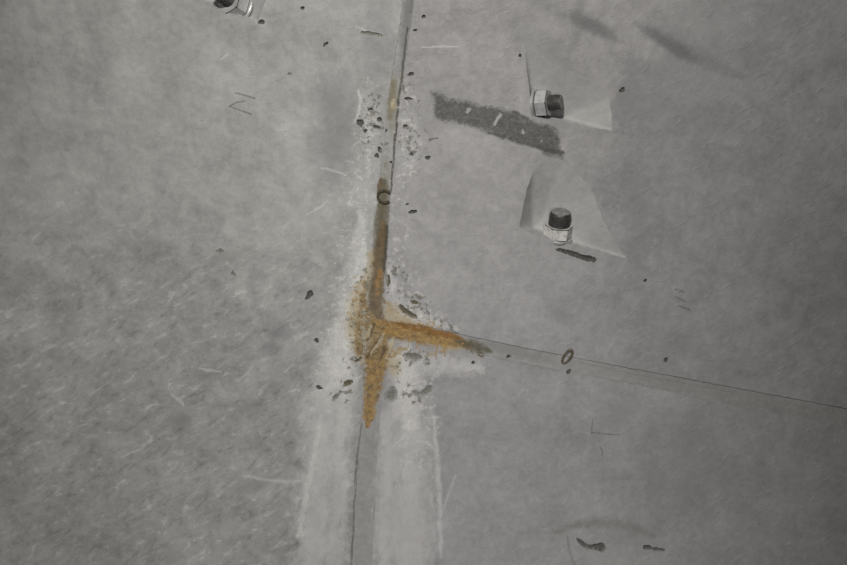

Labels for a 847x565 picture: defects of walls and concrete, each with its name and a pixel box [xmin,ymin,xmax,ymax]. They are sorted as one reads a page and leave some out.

damp [342,179,388,325]
rust [347,220,492,428]
damp [300,335,349,565]
damp [379,354,479,565]